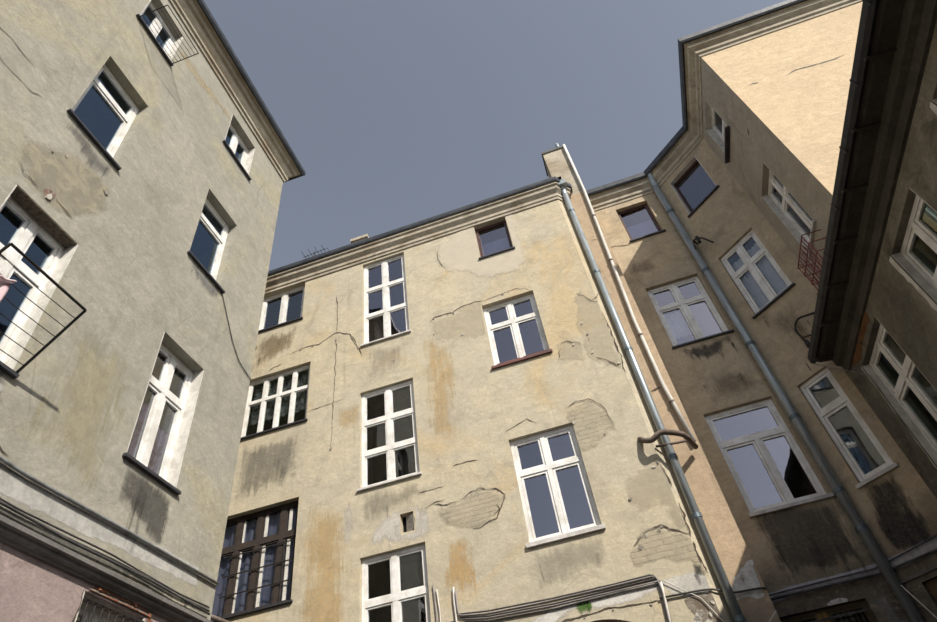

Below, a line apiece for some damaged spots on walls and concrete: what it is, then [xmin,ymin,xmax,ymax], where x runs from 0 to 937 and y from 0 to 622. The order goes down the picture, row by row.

spalling [21,164,72,218]
crack [269,297,362,450]
peeling [731,559,765,600]
peeling [684,592,723,622]